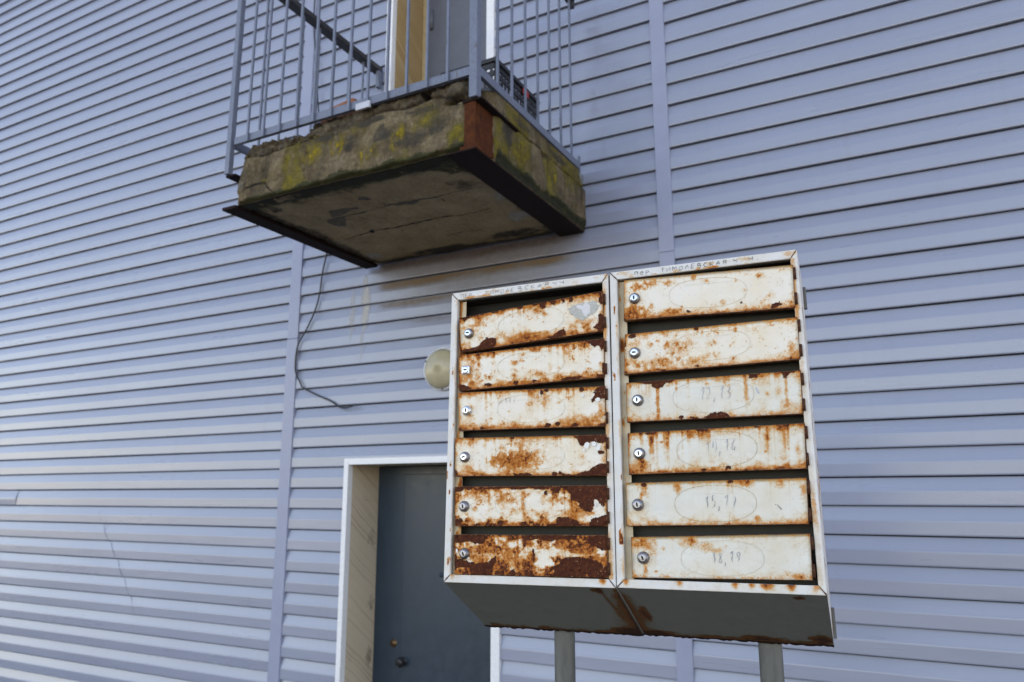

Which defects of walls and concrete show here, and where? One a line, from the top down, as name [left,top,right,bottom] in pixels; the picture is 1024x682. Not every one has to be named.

water stain [285,106,445,171]
crack [340,187,489,240]